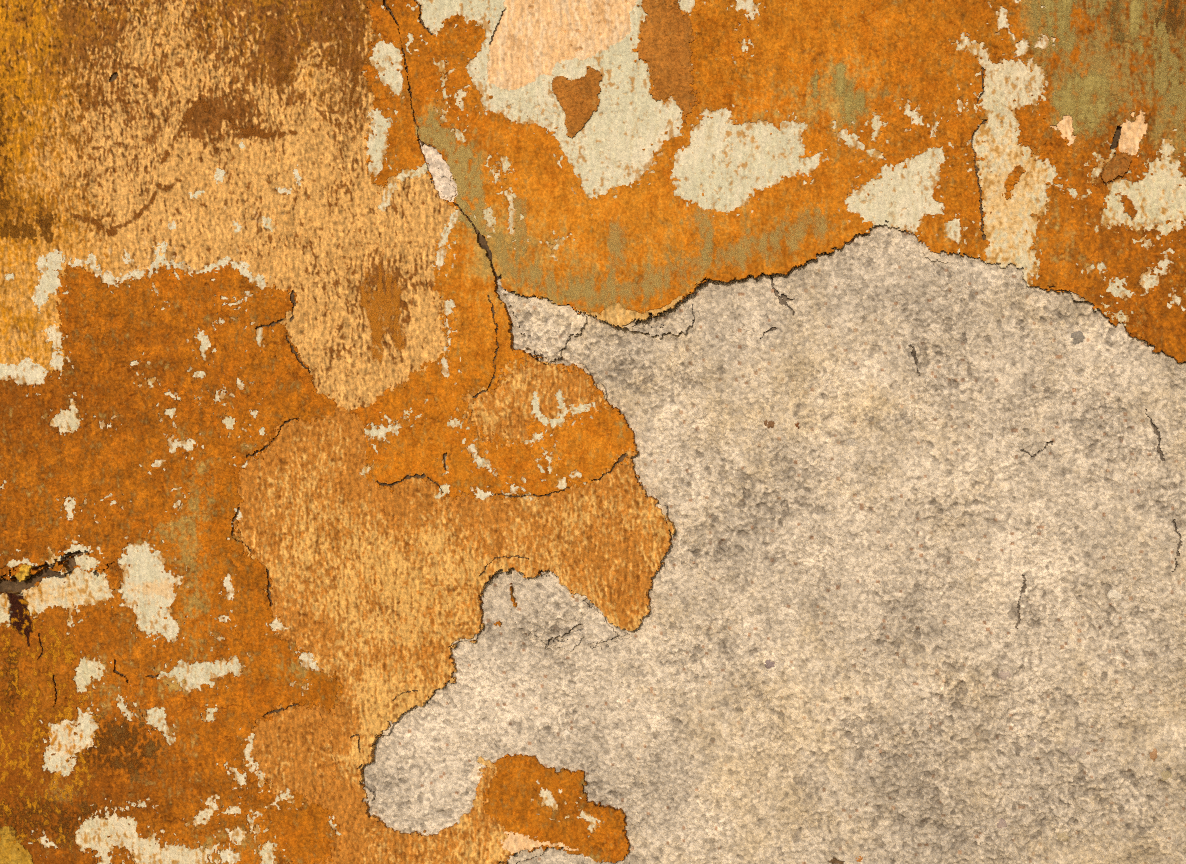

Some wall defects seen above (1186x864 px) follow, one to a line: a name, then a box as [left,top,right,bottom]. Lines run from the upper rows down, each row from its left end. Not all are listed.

crack [384,0,433,146]
peeling [406,0,829,217]
peeling [894,98,949,138]
peeling [1086,110,1186,296]
crack [454,203,499,398]
peeling [1081,261,1135,304]
peeling [130,352,204,475]
crack [377,453,447,493]
crack [493,453,628,497]
crack [0,551,99,593]
peeling [0,530,250,722]
peeling [72,758,300,864]